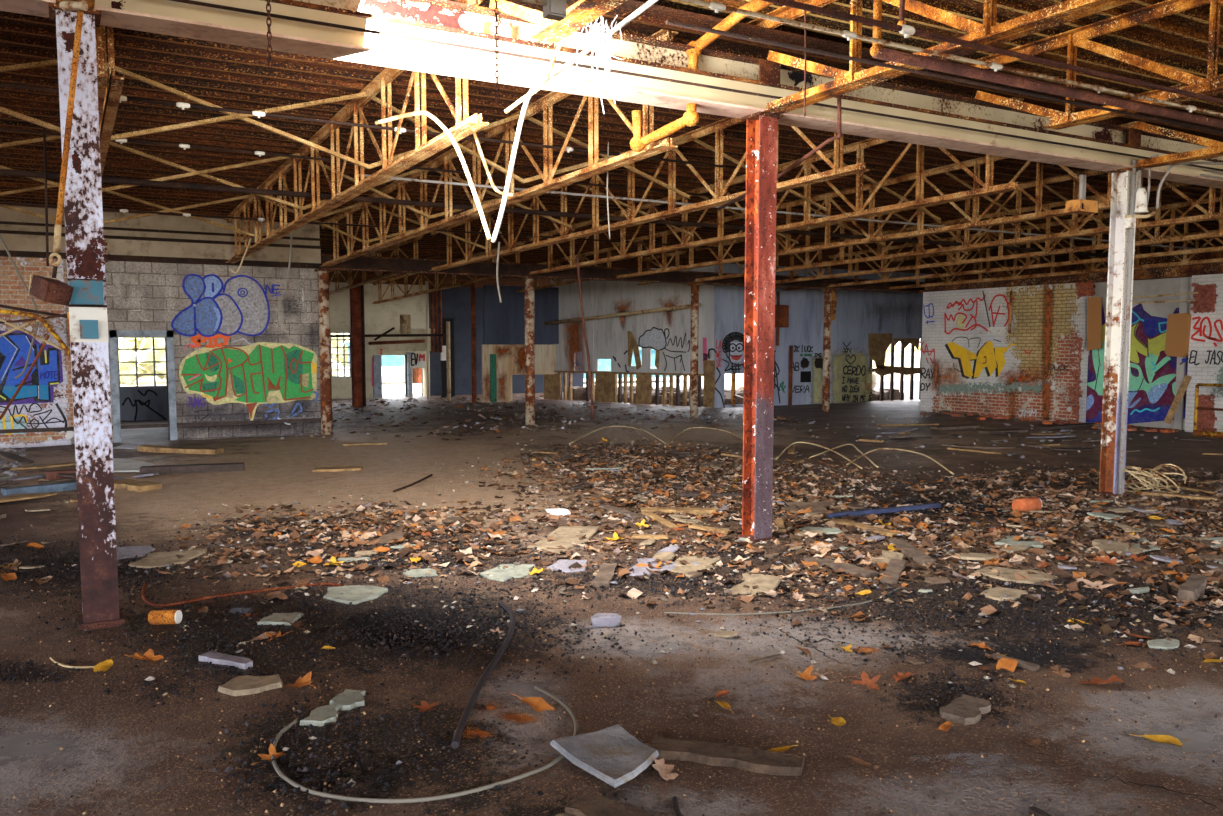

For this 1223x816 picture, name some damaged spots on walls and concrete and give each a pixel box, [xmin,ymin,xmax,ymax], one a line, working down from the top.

peeling [352,0,475,30]
peeling [60,31,75,53]
corrosion [1092,128,1113,141]
peeling [71,144,82,174]
peeling [0,238,110,444]
peeling [923,277,1095,422]